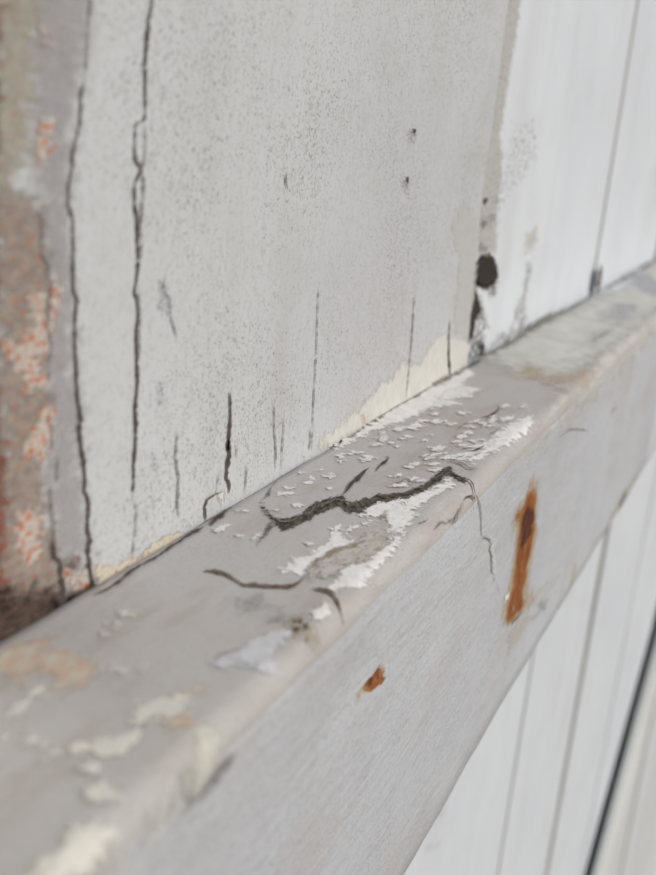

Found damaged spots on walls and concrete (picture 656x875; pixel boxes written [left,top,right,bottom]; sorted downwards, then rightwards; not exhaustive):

crack [40,0,96,607]
peeling [0,0,188,642]
crack [132,0,154,554]
peeling [276,0,535,592]
peeling [480,264,656,390]
crack [175,393,248,527]
spalling [211,601,331,674]
crack [205,569,344,624]
rust [362,656,386,692]
crack [258,407,500,582]
rust [504,490,537,623]
peeling [0,686,192,804]